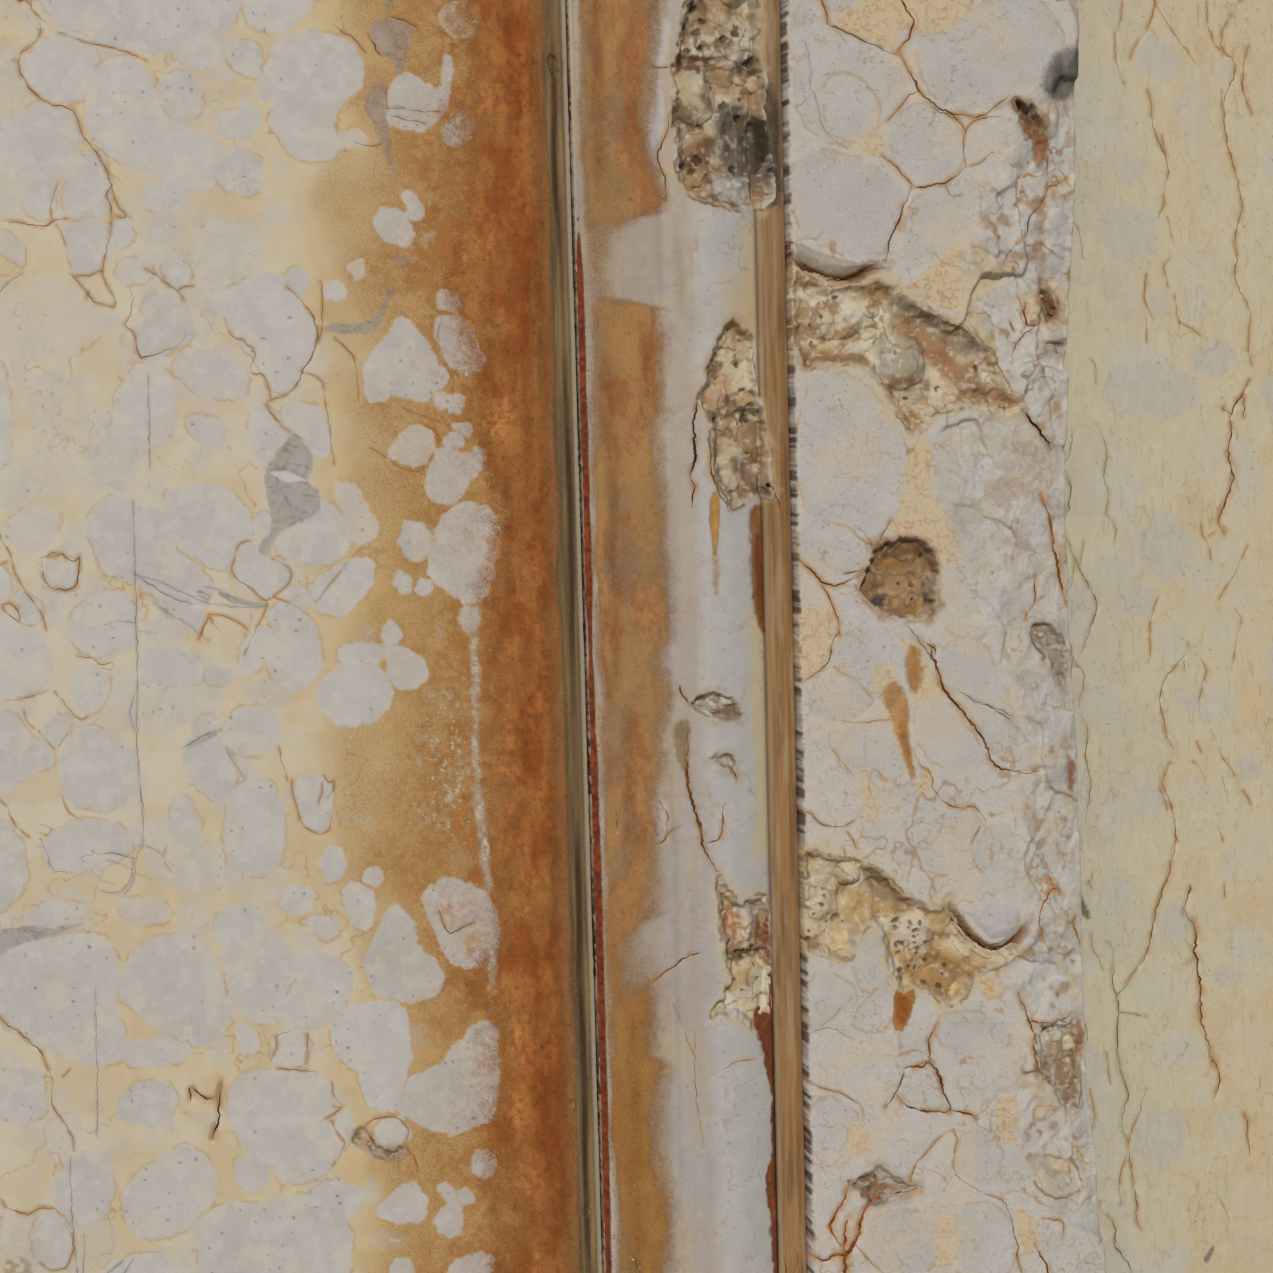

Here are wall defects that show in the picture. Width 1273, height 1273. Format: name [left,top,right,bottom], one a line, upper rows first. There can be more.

spalling [668,0,778,213]
spalling [786,266,1026,438]
corrosion [365,0,581,1273]
corrosion [573,0,673,1273]
crack [656,686,737,872]
corrosion [750,505,765,632]
spalling [857,536,941,622]
crack [908,627,1036,774]
crack [1018,0,1252,1269]
spalling [798,844,1022,1008]
corrosion [754,973,779,1273]
crack [784,1024,1070,1273]